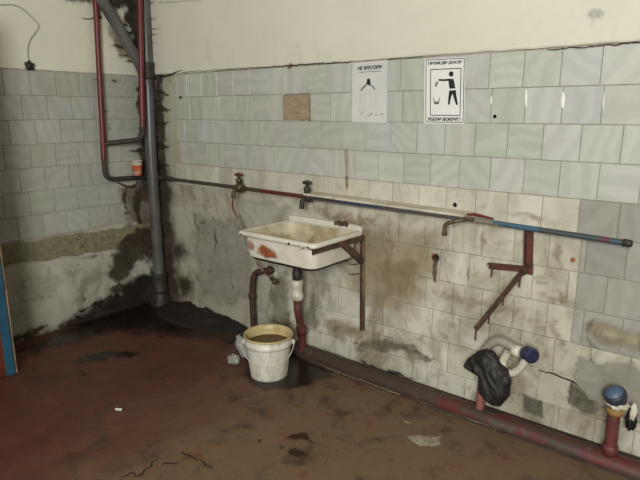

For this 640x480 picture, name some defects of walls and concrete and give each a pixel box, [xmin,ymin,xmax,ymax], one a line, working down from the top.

damp [109,0,138,49]
peeling [283,94,311,122]
peeling [1,223,150,266]
damp [13,128,243,355]
peeling [194,201,287,311]
damp [378,339,428,362]
damp [244,352,332,389]
crack [538,370,578,405]
crack [122,452,212,477]